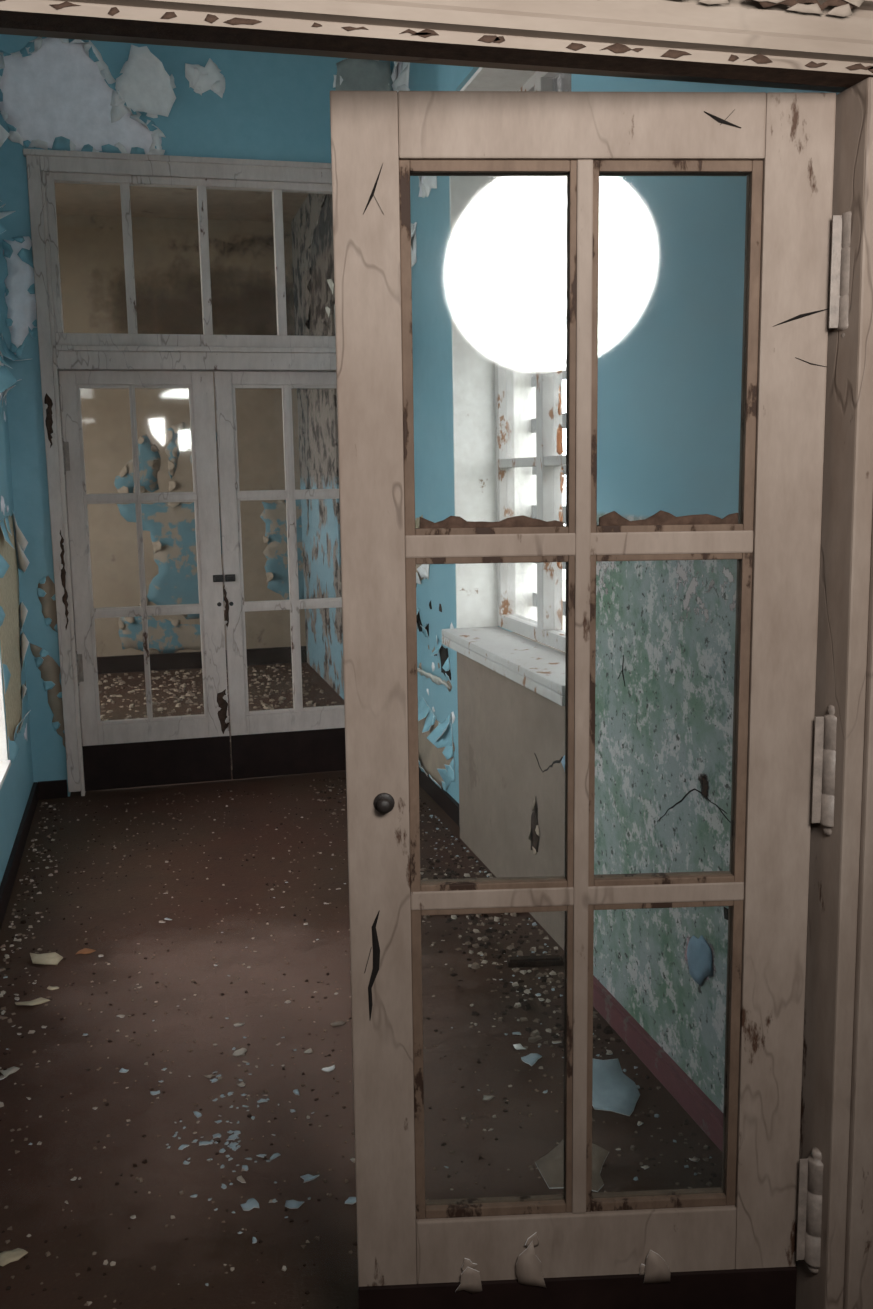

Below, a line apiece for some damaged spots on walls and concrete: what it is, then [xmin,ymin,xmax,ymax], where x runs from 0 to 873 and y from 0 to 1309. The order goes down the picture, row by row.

peeling [747,0,864,17]
peeling [0,37,225,155]
peeling [333,58,410,92]
peeling [418,176,437,198]
peeling [0,200,38,422]
peeling [0,496,69,763]
peeling [416,564,430,587]
peeling [416,601,456,791]
crack [364,911,380,1020]